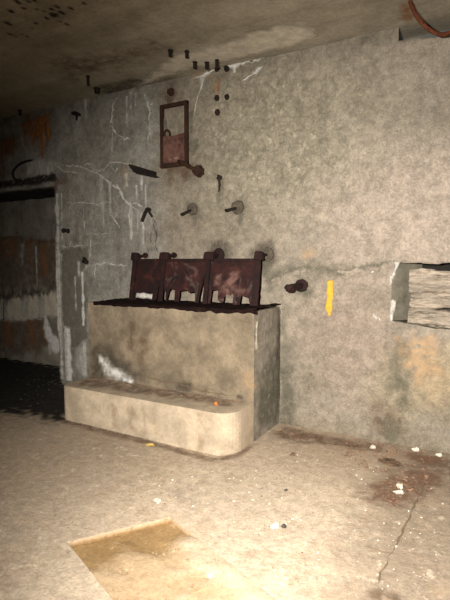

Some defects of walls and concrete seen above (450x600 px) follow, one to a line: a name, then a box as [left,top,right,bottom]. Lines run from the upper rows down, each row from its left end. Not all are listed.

crack [228,58,262,80]
crack [56,98,157,279]
damp [0,193,134,383]
crack [368,485,424,581]